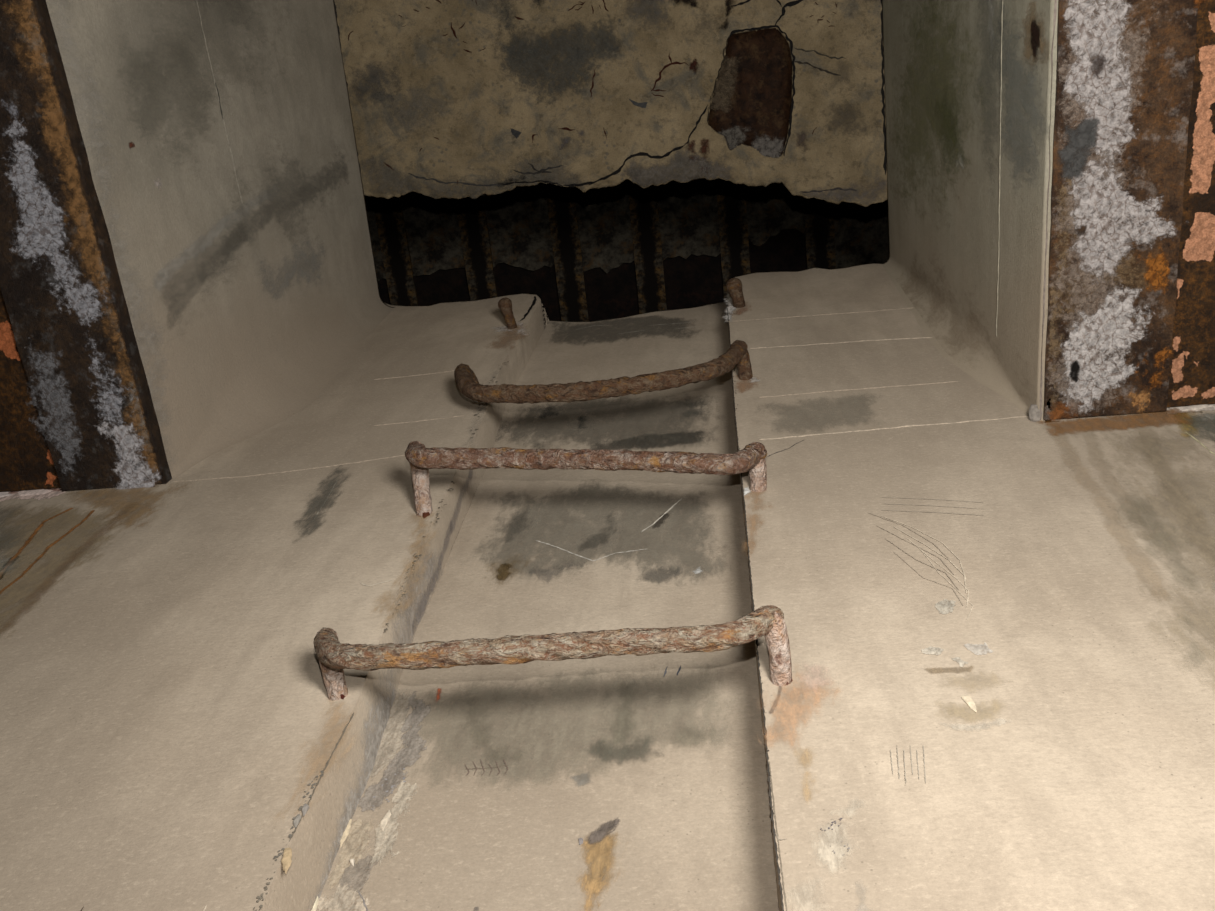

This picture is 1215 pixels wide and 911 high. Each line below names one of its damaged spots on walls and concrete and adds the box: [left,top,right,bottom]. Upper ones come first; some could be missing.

crack [334,2,349,95]
crack [502,0,846,187]
spalling [705,0,805,162]
crack [879,0,887,175]
peeling [1189,11,1215,194]
peeling [1183,212,1215,262]
peeling [1167,336,1215,413]
leakage [303,470,341,534]